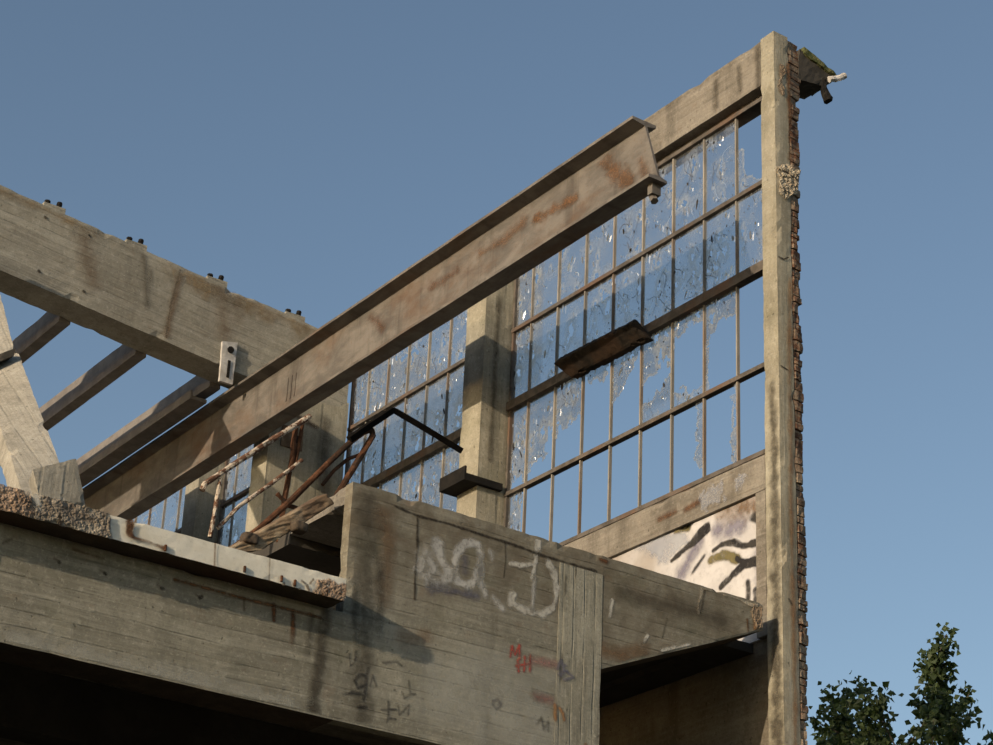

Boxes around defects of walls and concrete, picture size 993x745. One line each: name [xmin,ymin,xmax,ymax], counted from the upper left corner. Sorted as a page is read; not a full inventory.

spalling [775,164,801,199]
spalling [0,484,112,539]
corrosion [126,519,165,549]
corrosion [173,578,322,637]